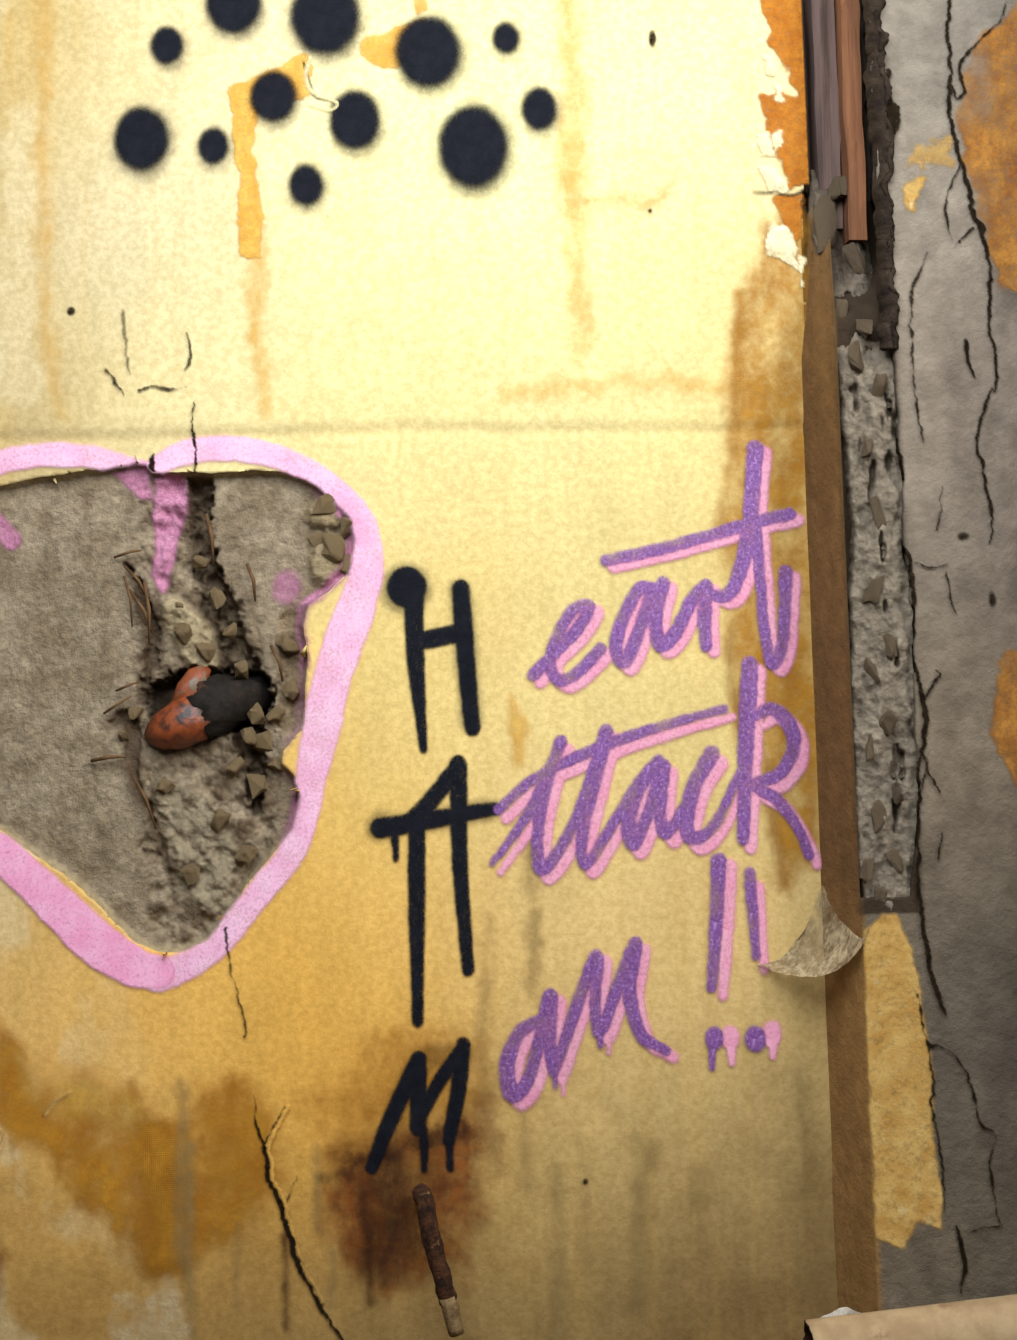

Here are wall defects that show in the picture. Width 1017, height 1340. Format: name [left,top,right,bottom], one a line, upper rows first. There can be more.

crack [886,68,901,135]
crack [895,0,1006,543]
flaking render [0,462,354,953]
spalling [757,0,1017,1248]
crack [901,542,1002,1293]
water stain [0,1035,270,1290]
crack [254,1104,344,1340]
rust [322,1119,484,1292]
rust [423,1045,448,1088]